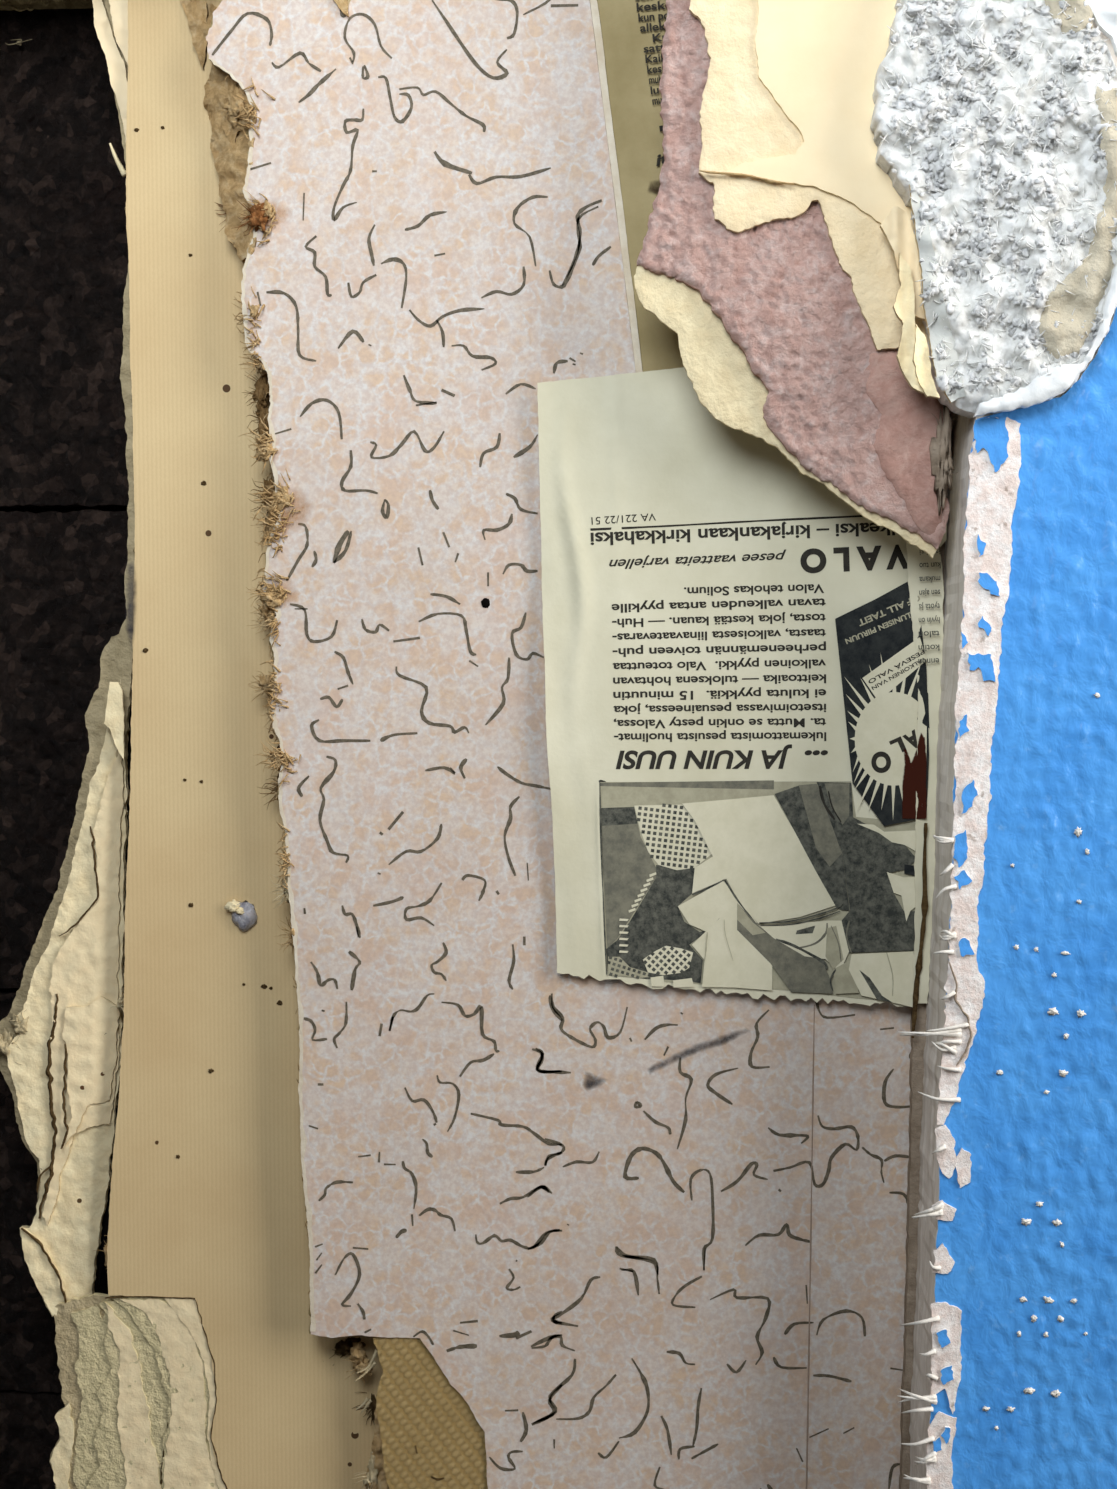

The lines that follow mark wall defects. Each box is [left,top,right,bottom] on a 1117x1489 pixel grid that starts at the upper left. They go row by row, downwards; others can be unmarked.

peeling [92,0,128,185]
peeling [1087,0,1117,57]
peeling [634,0,1021,1188]
peeling [0,263,226,1489]
peeling [912,1200,957,1221]
peeling [929,1243,955,1274]
peeling [897,1302,962,1489]